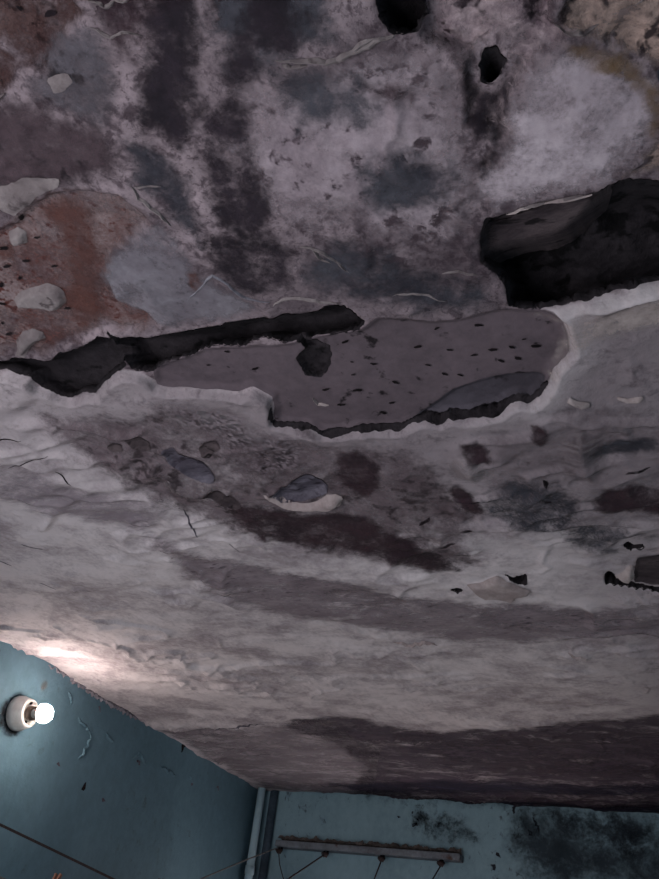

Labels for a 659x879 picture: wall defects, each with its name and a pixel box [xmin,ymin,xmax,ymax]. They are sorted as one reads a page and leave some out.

flaking render [0,0,82,98]
leakage [0,31,115,186]
leakage [95,0,483,326]
flaking render [376,0,659,135]
flaking render [154,144,659,431]
leakage [3,477,152,526]
flaking render [264,494,343,512]
leakage [43,407,625,572]
leakage [593,438,658,456]
leakage [596,485,659,514]
flaking render [615,555,659,585]
leakage [164,715,659,879]